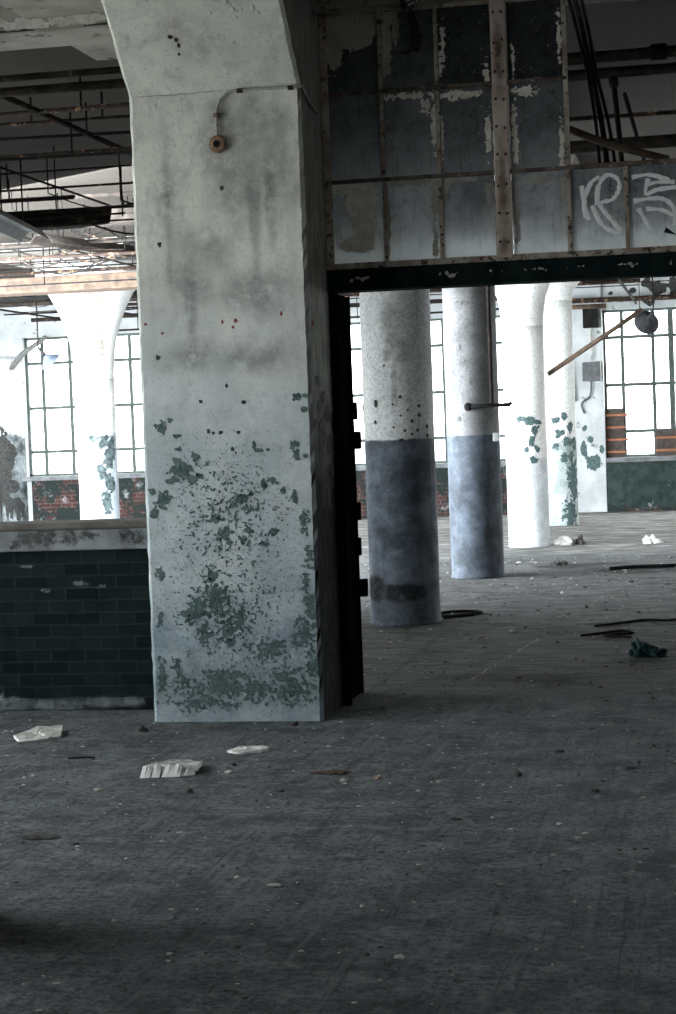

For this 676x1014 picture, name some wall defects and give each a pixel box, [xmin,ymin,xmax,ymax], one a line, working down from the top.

peeling [326,12,399,78]
peeling [384,17,490,167]
peeling [443,106,493,212]
peeling [510,37,567,245]
peeling [332,183,378,253]
peeling [0,426,25,522]
peeling [88,433,116,517]
peeling [514,412,676,526]
peeling [148,375,335,714]